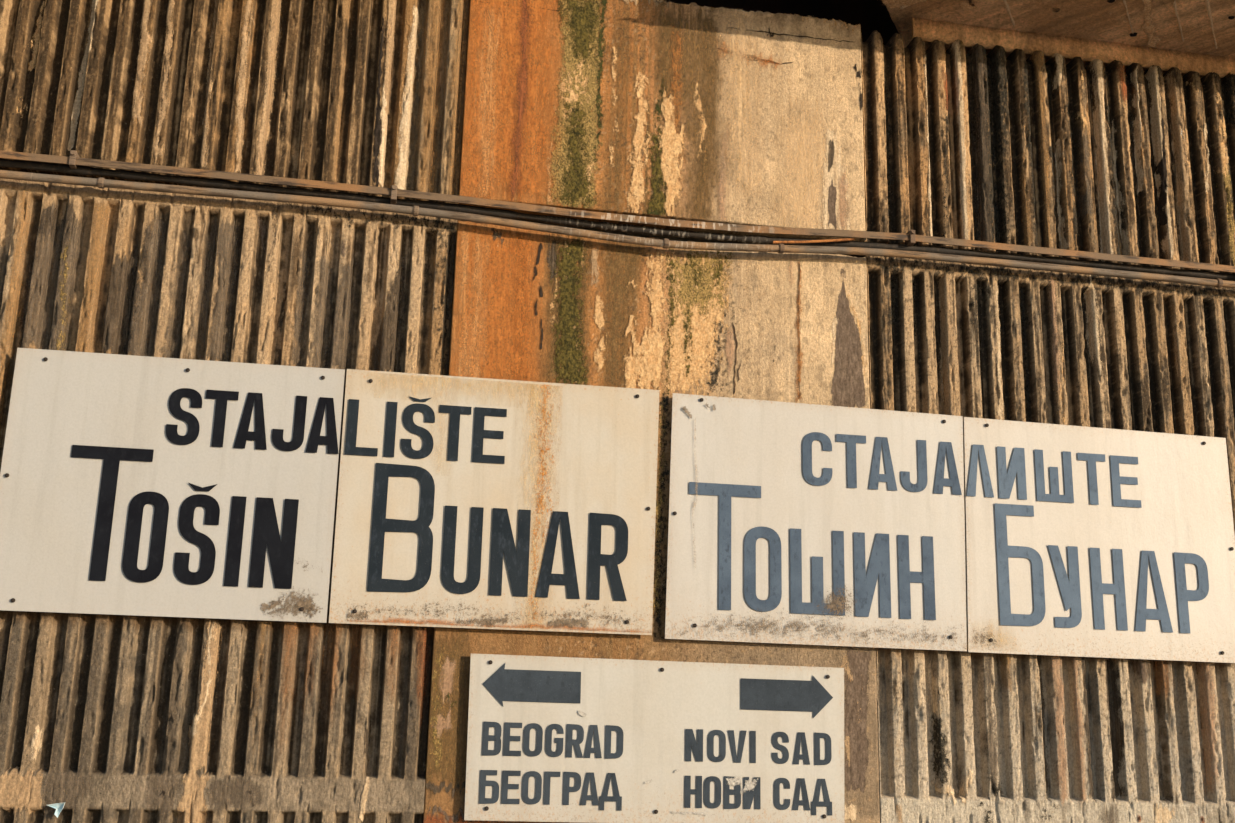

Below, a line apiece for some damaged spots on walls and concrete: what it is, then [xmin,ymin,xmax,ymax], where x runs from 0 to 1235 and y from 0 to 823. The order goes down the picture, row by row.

leakage [256,0,282,175]
leakage [393,0,426,190]
corrosion [429,0,555,203]
peeling [609,46,685,216]
leakage [924,40,1038,253]
leakage [1045,53,1174,264]
leakage [0,245,9,318]
leakage [20,193,82,351]
leakage [101,214,239,362]
leakage [273,240,357,373]
leakage [369,217,456,375]
leakage [938,267,1003,420]